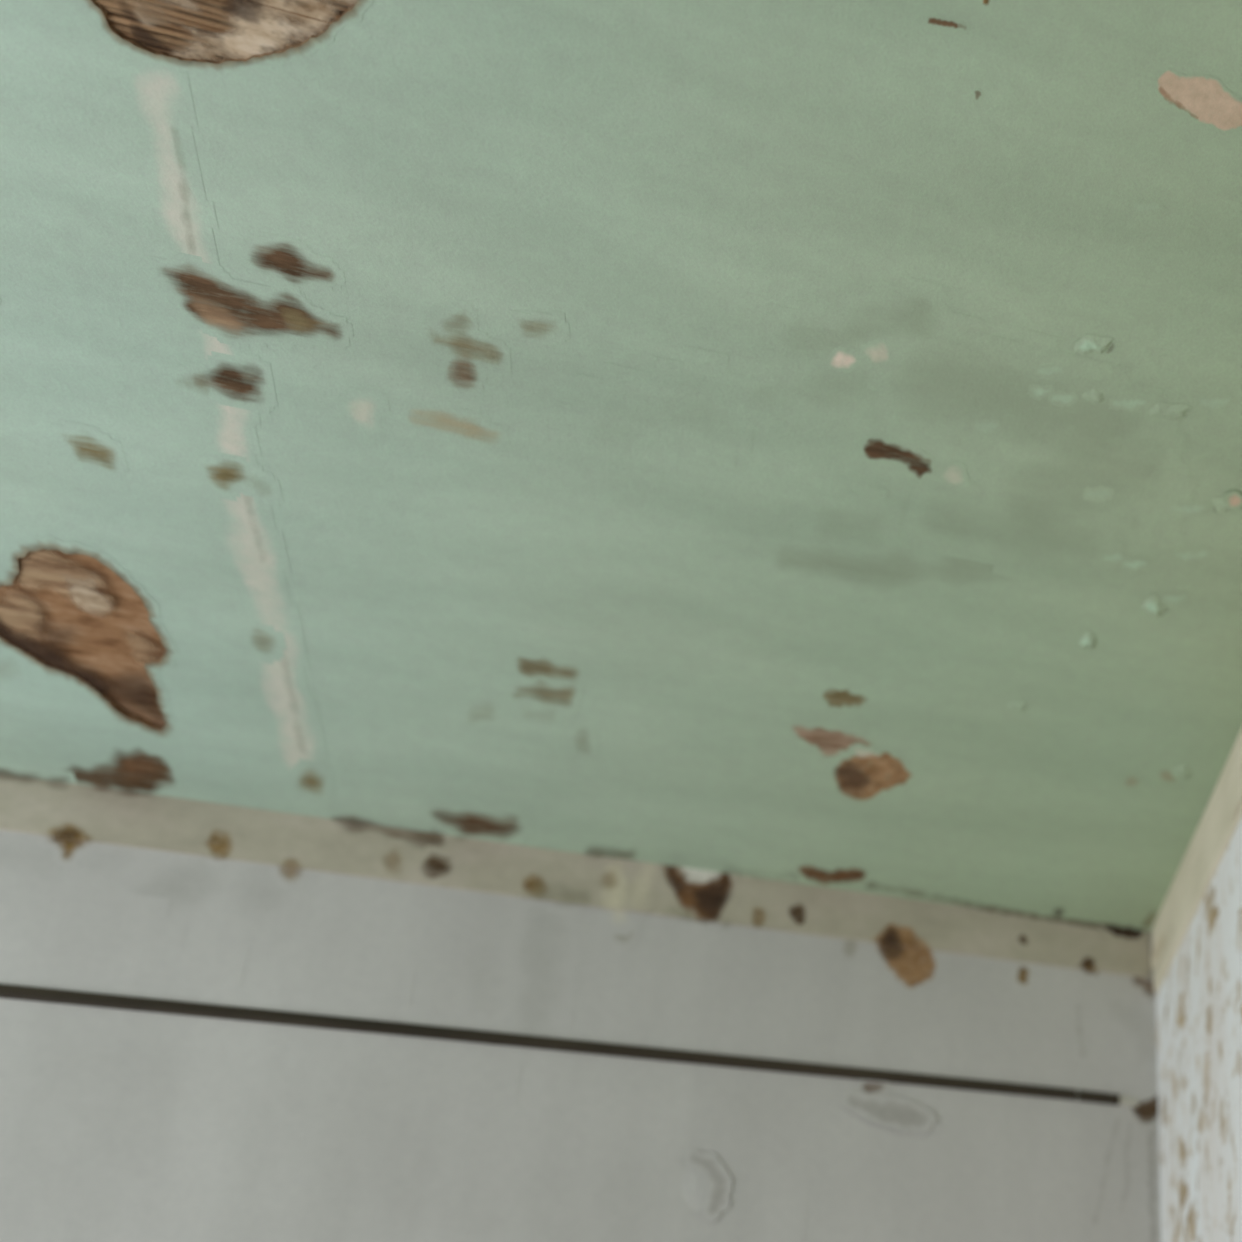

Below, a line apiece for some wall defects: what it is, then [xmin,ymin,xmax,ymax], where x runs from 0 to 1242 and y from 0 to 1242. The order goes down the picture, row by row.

flaking render [61,0,373,75]
peeling [1155,68,1242,133]
spalling [147,232,354,414]
peeling [826,338,893,373]
spalling [860,434,970,490]
flaking render [0,534,184,806]
spalling [788,685,916,804]
flaking render [655,864,739,934]
flaking render [868,919,939,993]